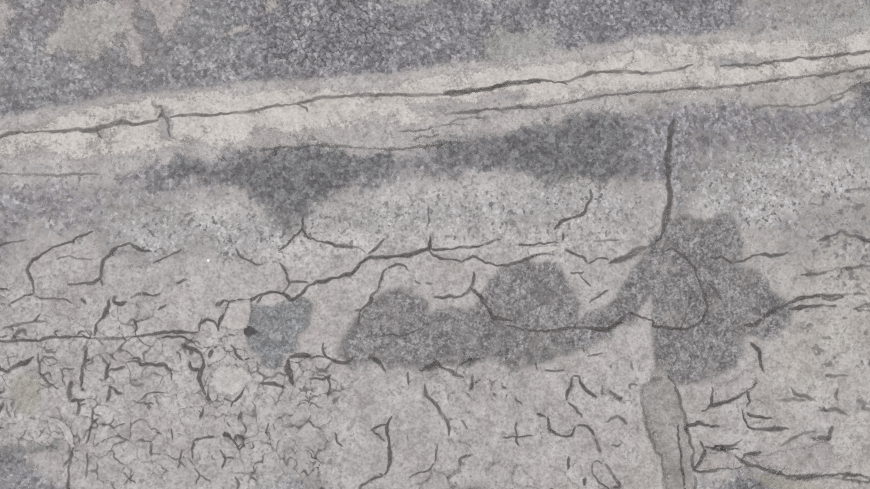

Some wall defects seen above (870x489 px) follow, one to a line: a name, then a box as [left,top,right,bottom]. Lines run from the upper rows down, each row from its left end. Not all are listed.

crack [373,91,397,99]
crack [449,83,506,111]
crack [533,70,665,93]
crack [721,50,870,86]
crack [0,112,234,139]
crack [822,232,870,242]
crack [0,120,788,489]
damp [335,212,794,386]
damp [245,297,313,369]
crack [677,273,870,489]
damp [753,475,820,489]